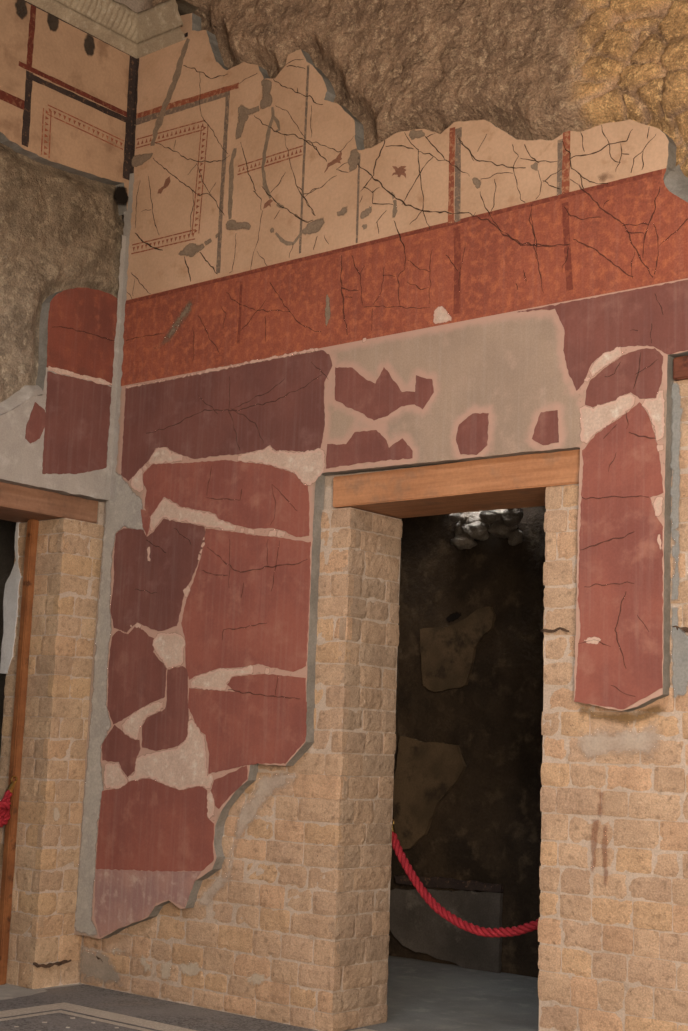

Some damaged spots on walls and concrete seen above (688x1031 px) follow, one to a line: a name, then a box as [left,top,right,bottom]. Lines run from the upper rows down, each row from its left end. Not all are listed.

spalling [185,0,688,177]
spalling [0,143,124,403]
crack [135,38,688,499]
peeling [126,348,318,389]
crack [147,485,307,597]
crack [581,532,633,550]
peeling [122,702,163,740]
peeling [104,715,215,819]
peeling [191,665,269,691]
crack [228,677,298,699]
crack [541,582,688,697]